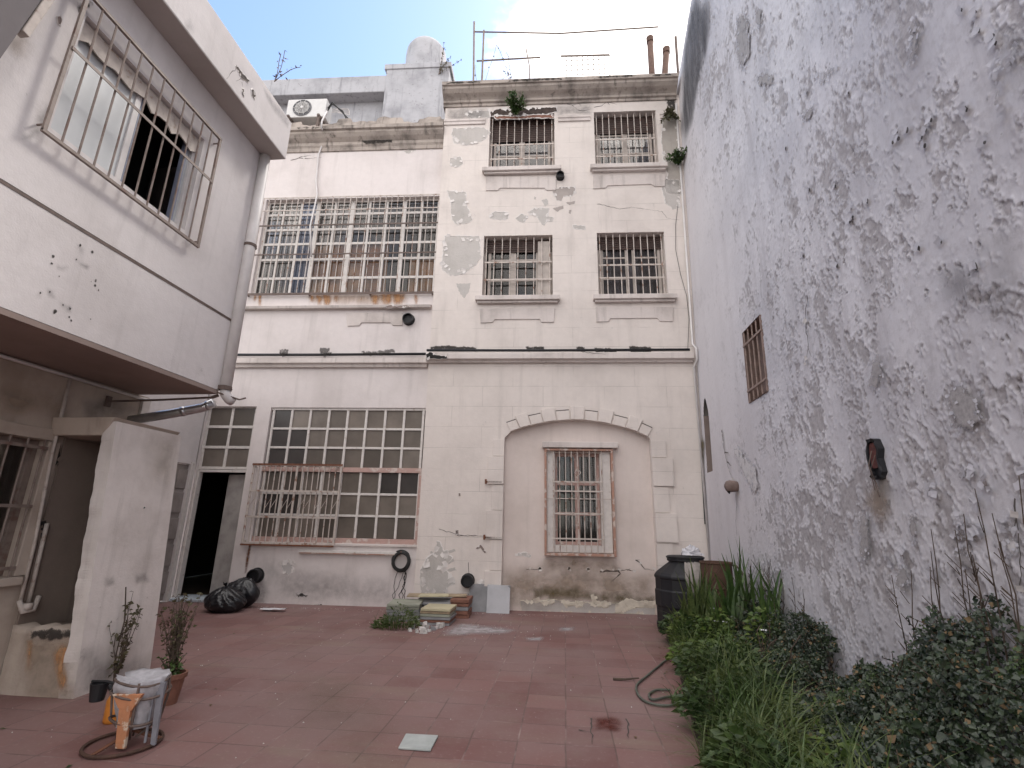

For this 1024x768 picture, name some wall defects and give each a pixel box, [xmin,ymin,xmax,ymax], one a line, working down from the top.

peeling [734,9,775,88]
peeling [955,5,1018,135]
peeling [450,107,558,168]
peeling [660,118,682,210]
peeling [489,186,586,230]
peeling [439,190,481,298]
corrosion [361,294,416,303]
peeling [419,541,455,593]
flaking render [949,463,993,574]
peeling [996,514,1020,559]
flaking render [520,594,656,615]
corrosion [55,647,67,686]